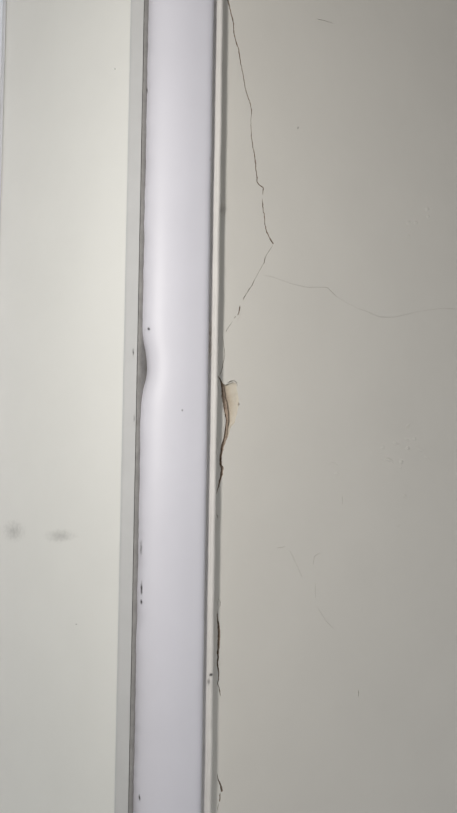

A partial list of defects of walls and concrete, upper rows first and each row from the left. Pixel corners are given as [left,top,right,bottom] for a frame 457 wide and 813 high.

crack [220,0,274,374]
flaking render [218,376,239,437]
crack [216,436,228,494]
crack [215,614,223,696]